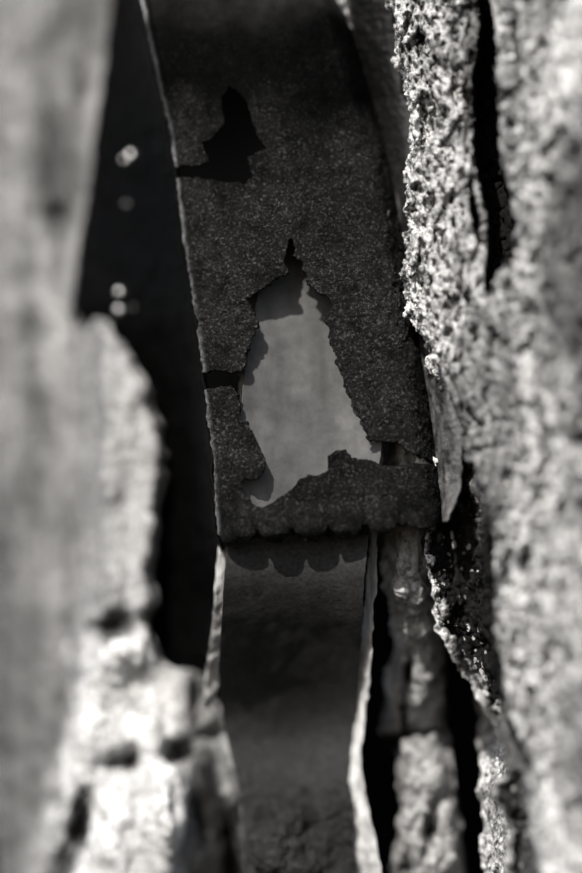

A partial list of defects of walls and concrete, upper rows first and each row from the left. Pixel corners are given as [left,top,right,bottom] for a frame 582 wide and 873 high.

crack [462,0,516,297]
peeling [203,541,227,709]
peeling [349,529,381,873]
spalling [426,469,543,873]